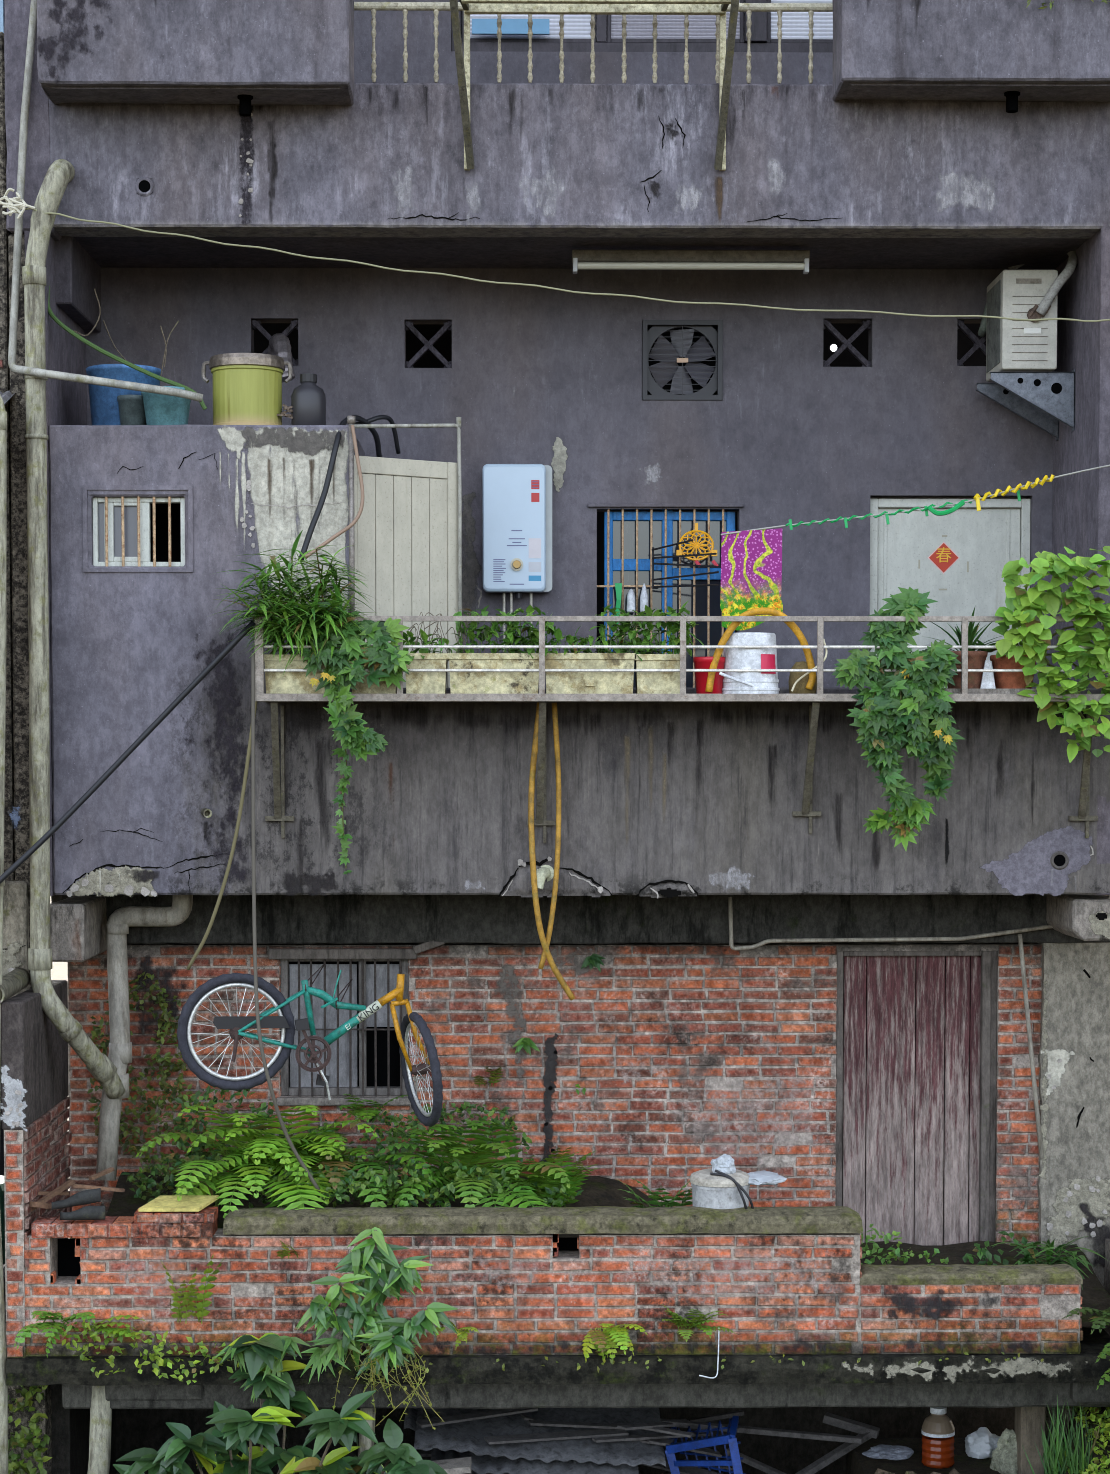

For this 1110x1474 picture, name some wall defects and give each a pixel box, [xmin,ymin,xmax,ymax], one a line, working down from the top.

leakage [37,0,112,82]
leakage [238,105,277,224]
peeling [218,426,349,613]
leakage [279,705,347,849]
leakage [697,706,855,778]
spalling [63,855,216,897]
leakage [285,824,336,896]
peeling [980,826,1094,896]
peeling [0,1065,28,1131]